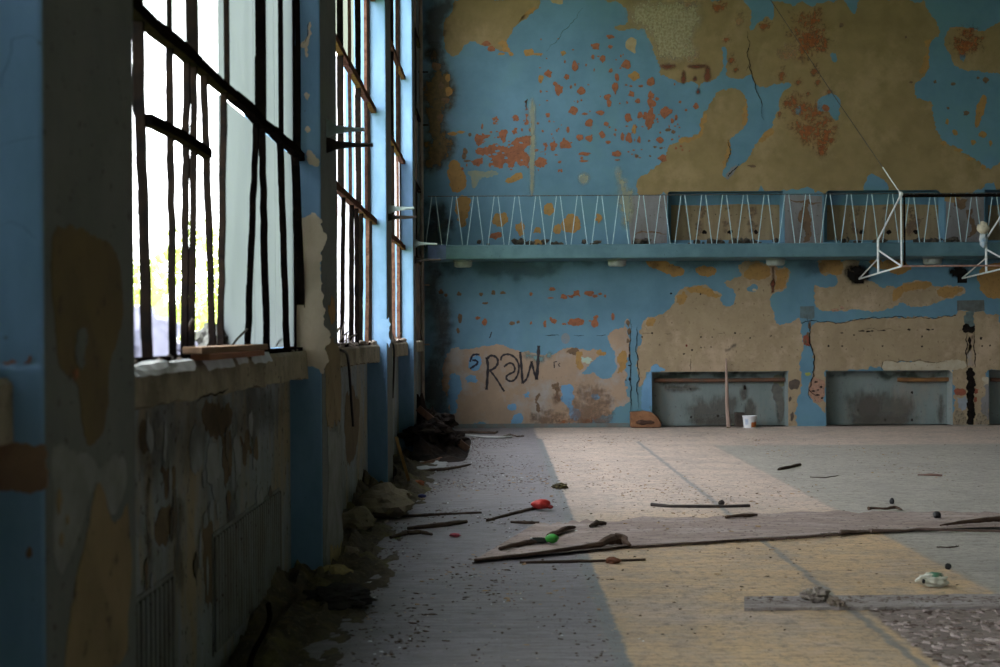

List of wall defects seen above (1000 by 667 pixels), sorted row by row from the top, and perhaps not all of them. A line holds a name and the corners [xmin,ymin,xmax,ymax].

peeling [306,150,320,167]
water stain [423,0,465,171]
peeling [443,0,1000,245]
crack [746,35,763,118]
corrosion [778,64,837,155]
peeling [296,213,360,565]
peeling [441,260,1000,426]